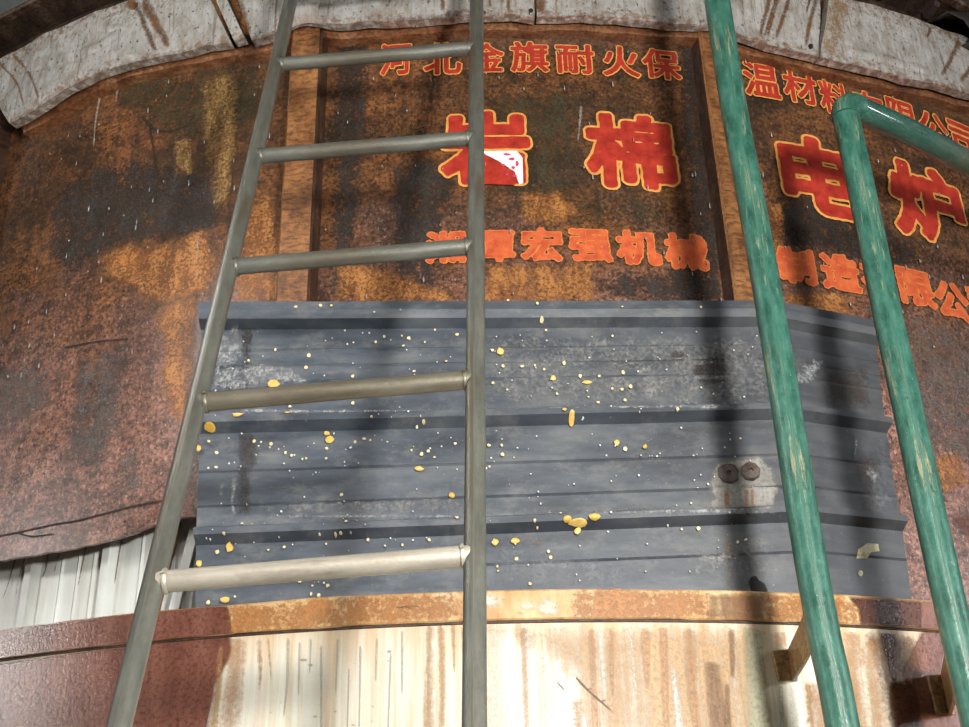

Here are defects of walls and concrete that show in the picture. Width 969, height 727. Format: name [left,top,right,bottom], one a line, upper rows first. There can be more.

rust [126,0,169,50]
rust [286,22,470,53]
rust [484,21,709,49]
rust [760,0,790,36]
rust [737,40,969,115]
rust [23,42,274,202]
rust [336,265,455,302]
rust [485,262,595,301]
rust [103,230,219,421]
rust [0,613,134,727]
rust [132,592,463,727]
rust [551,588,803,727]